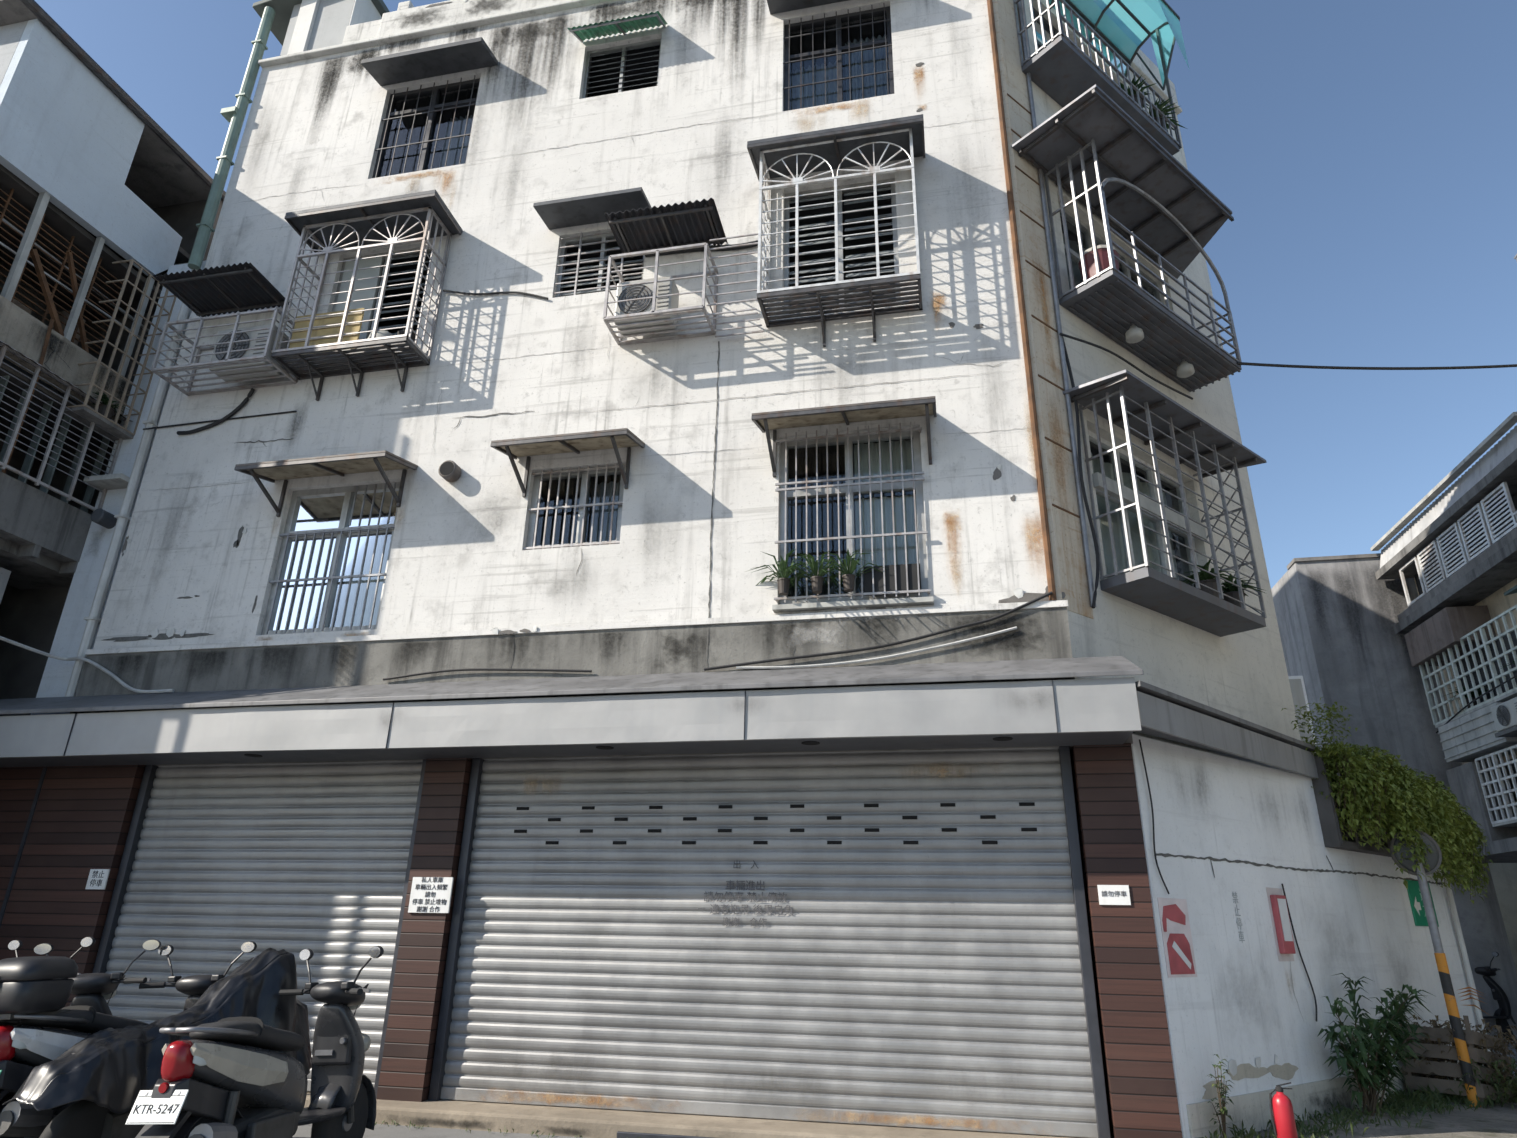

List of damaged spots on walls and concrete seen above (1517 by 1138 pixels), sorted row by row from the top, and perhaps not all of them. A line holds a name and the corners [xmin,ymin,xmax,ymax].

water stain [450,0,502,40]
water stain [595,0,665,21]
water stain [684,0,764,51]
water stain [319,11,433,104]
water stain [489,15,567,83]
water stain [665,636,694,659]
water stain [770,608,894,643]
water stain [970,614,1021,647]
peeling [1202,1054,1299,1099]